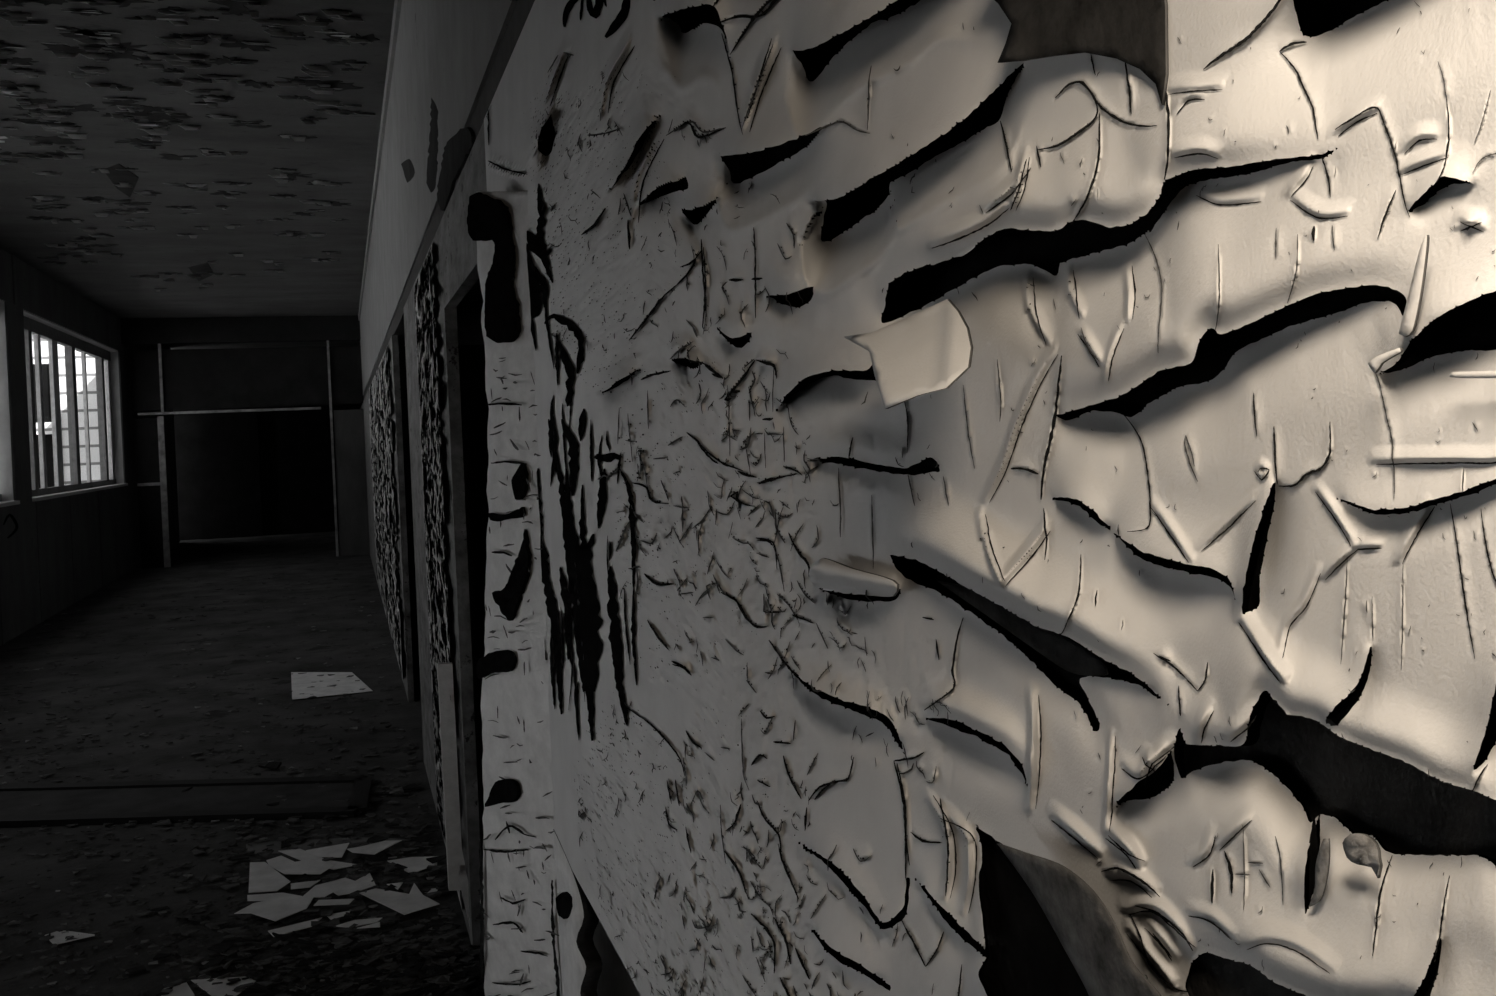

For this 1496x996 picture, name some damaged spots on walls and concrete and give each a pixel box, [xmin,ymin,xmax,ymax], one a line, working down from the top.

peeling [0,0,379,264]
peeling [401,98,476,211]
peeling [601,337,641,392]
peeling [609,0,1337,411]
crack [805,55,1218,642]
peeling [1054,141,1496,418]
peeling [1306,0,1385,32]
peeling [414,243,451,846]
peeling [487,464,532,621]
crack [479,52,978,996]
peeling [786,417,1496,996]
crack [1153,653,1208,716]